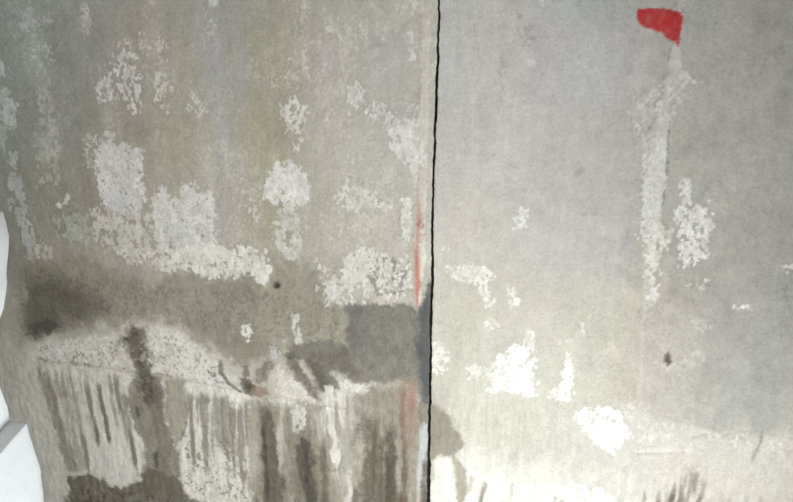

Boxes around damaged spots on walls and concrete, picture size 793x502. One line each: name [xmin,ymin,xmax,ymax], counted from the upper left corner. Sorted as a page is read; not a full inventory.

peeling [0,0,415,308]
damp [10,244,489,502]
peeling [331,79,430,244]
rust [410,154,427,311]
crack [426,0,441,502]
spalling [464,68,793,484]
damp [640,458,766,502]
crack [645,408,793,465]